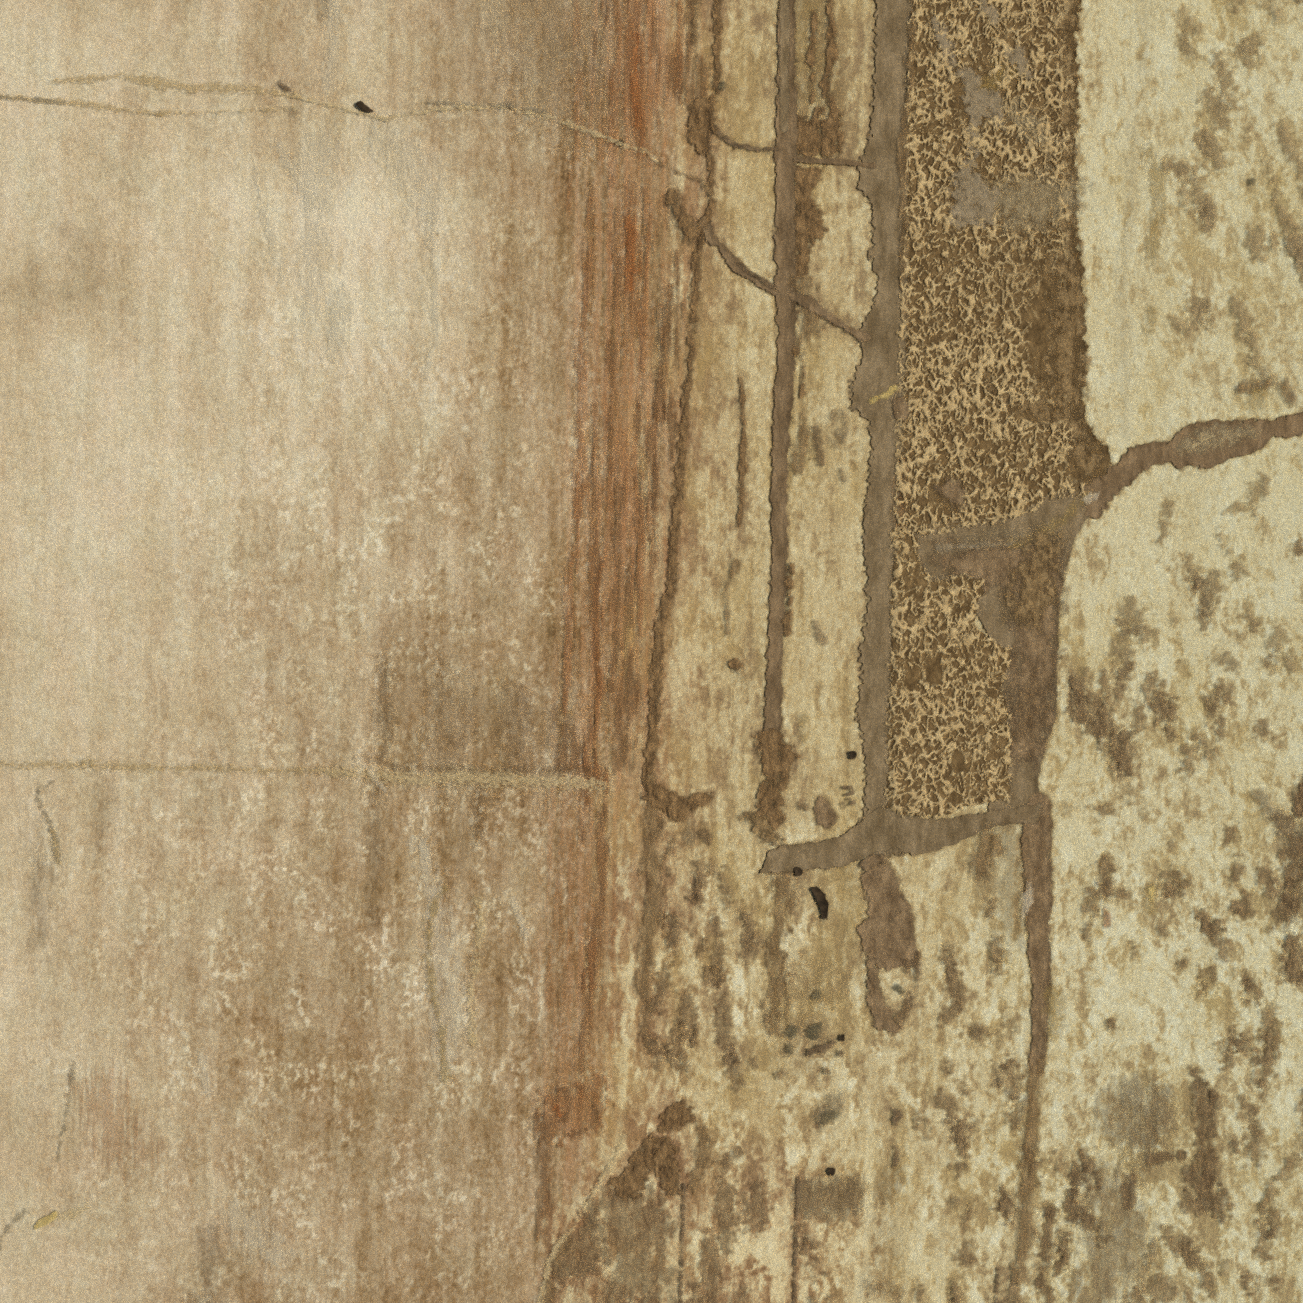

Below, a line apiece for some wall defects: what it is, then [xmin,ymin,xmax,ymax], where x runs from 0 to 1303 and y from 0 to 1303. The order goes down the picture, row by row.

corrosion [631,0,708,128]
corrosion [613,208,638,309]
spalling [884,0,1231,824]
crack [1083,375,1303,519]
crack [278,0,1054,1303]
corrosion [534,252,683,1241]
crack [1294,783,1303,817]
damp [760,872,796,1036]
damp [1268,813,1303,980]
damp [1121,1172,1137,1209]
damp [1145,1151,1188,1165]